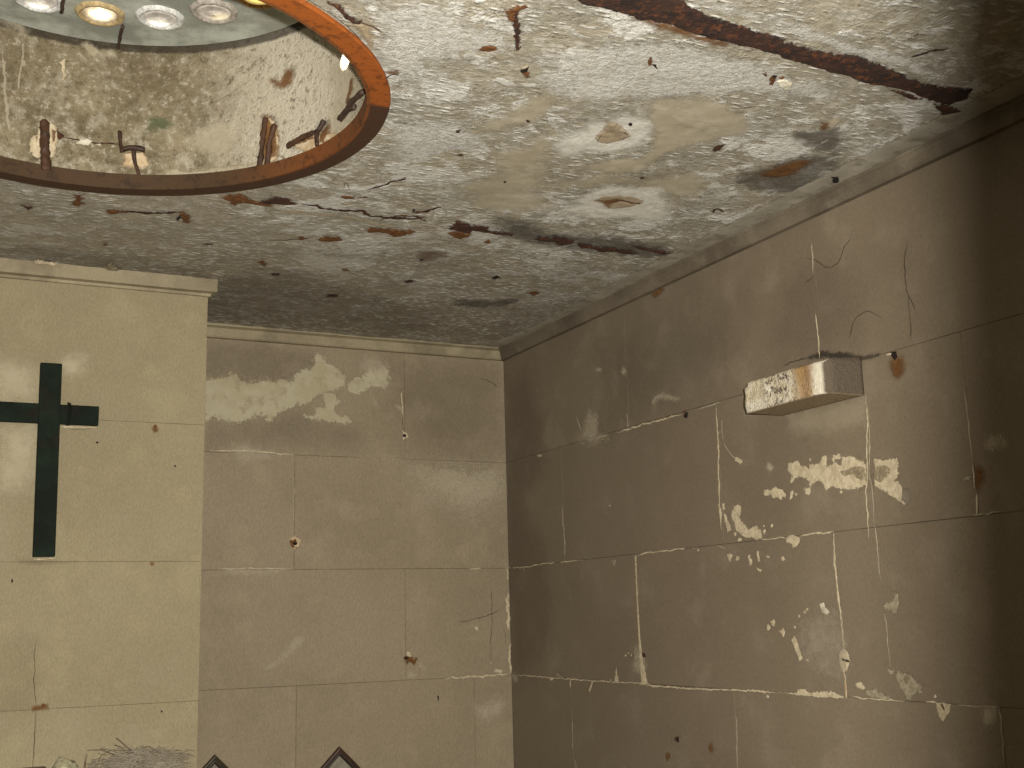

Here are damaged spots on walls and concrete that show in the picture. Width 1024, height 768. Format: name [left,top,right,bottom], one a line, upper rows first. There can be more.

rust [272,70,293,87]
rust [762,72,793,90]
spalling [30,119,64,171]
spalling [118,130,149,175]
spalling [256,89,366,166]
damp [553,117,653,158]
damp [796,129,841,151]
damp [563,177,674,221]
rust [367,227,415,237]
crack [904,246,917,335]
peeling [205,352,391,426]
peeling [764,454,910,505]